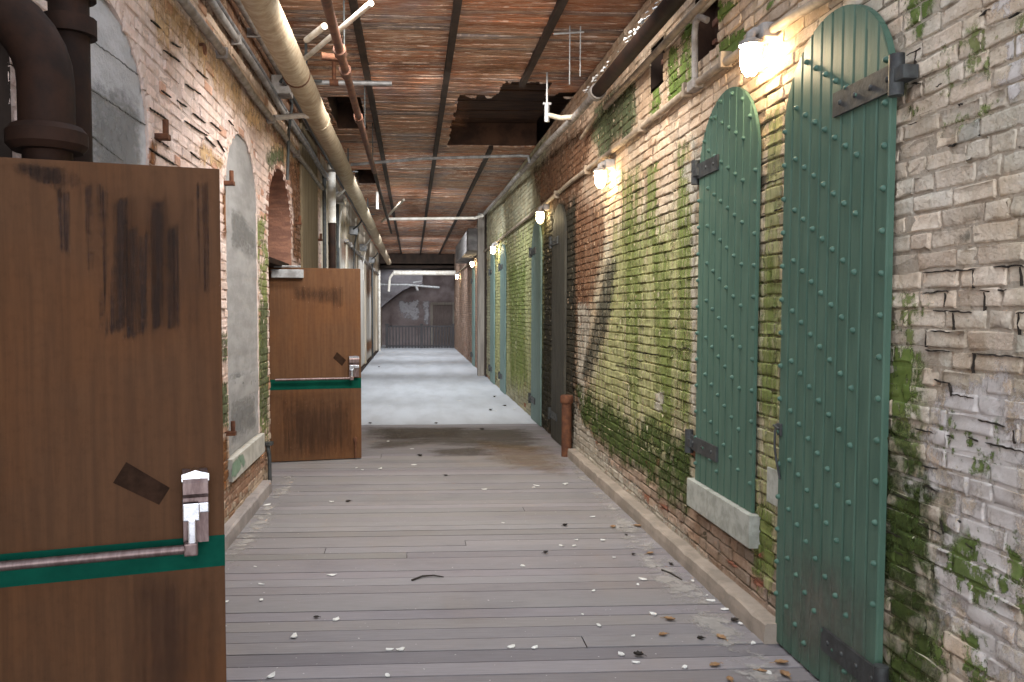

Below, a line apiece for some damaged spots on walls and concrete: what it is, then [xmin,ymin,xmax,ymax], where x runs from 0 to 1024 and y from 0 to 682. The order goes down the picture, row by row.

leakage [509,256,527,385]
leakage [541,197,709,560]
leakage [622,145,693,433]
crack [915,264,1024,453]
leakage [595,493,775,682]
leakage [904,369,1024,681]